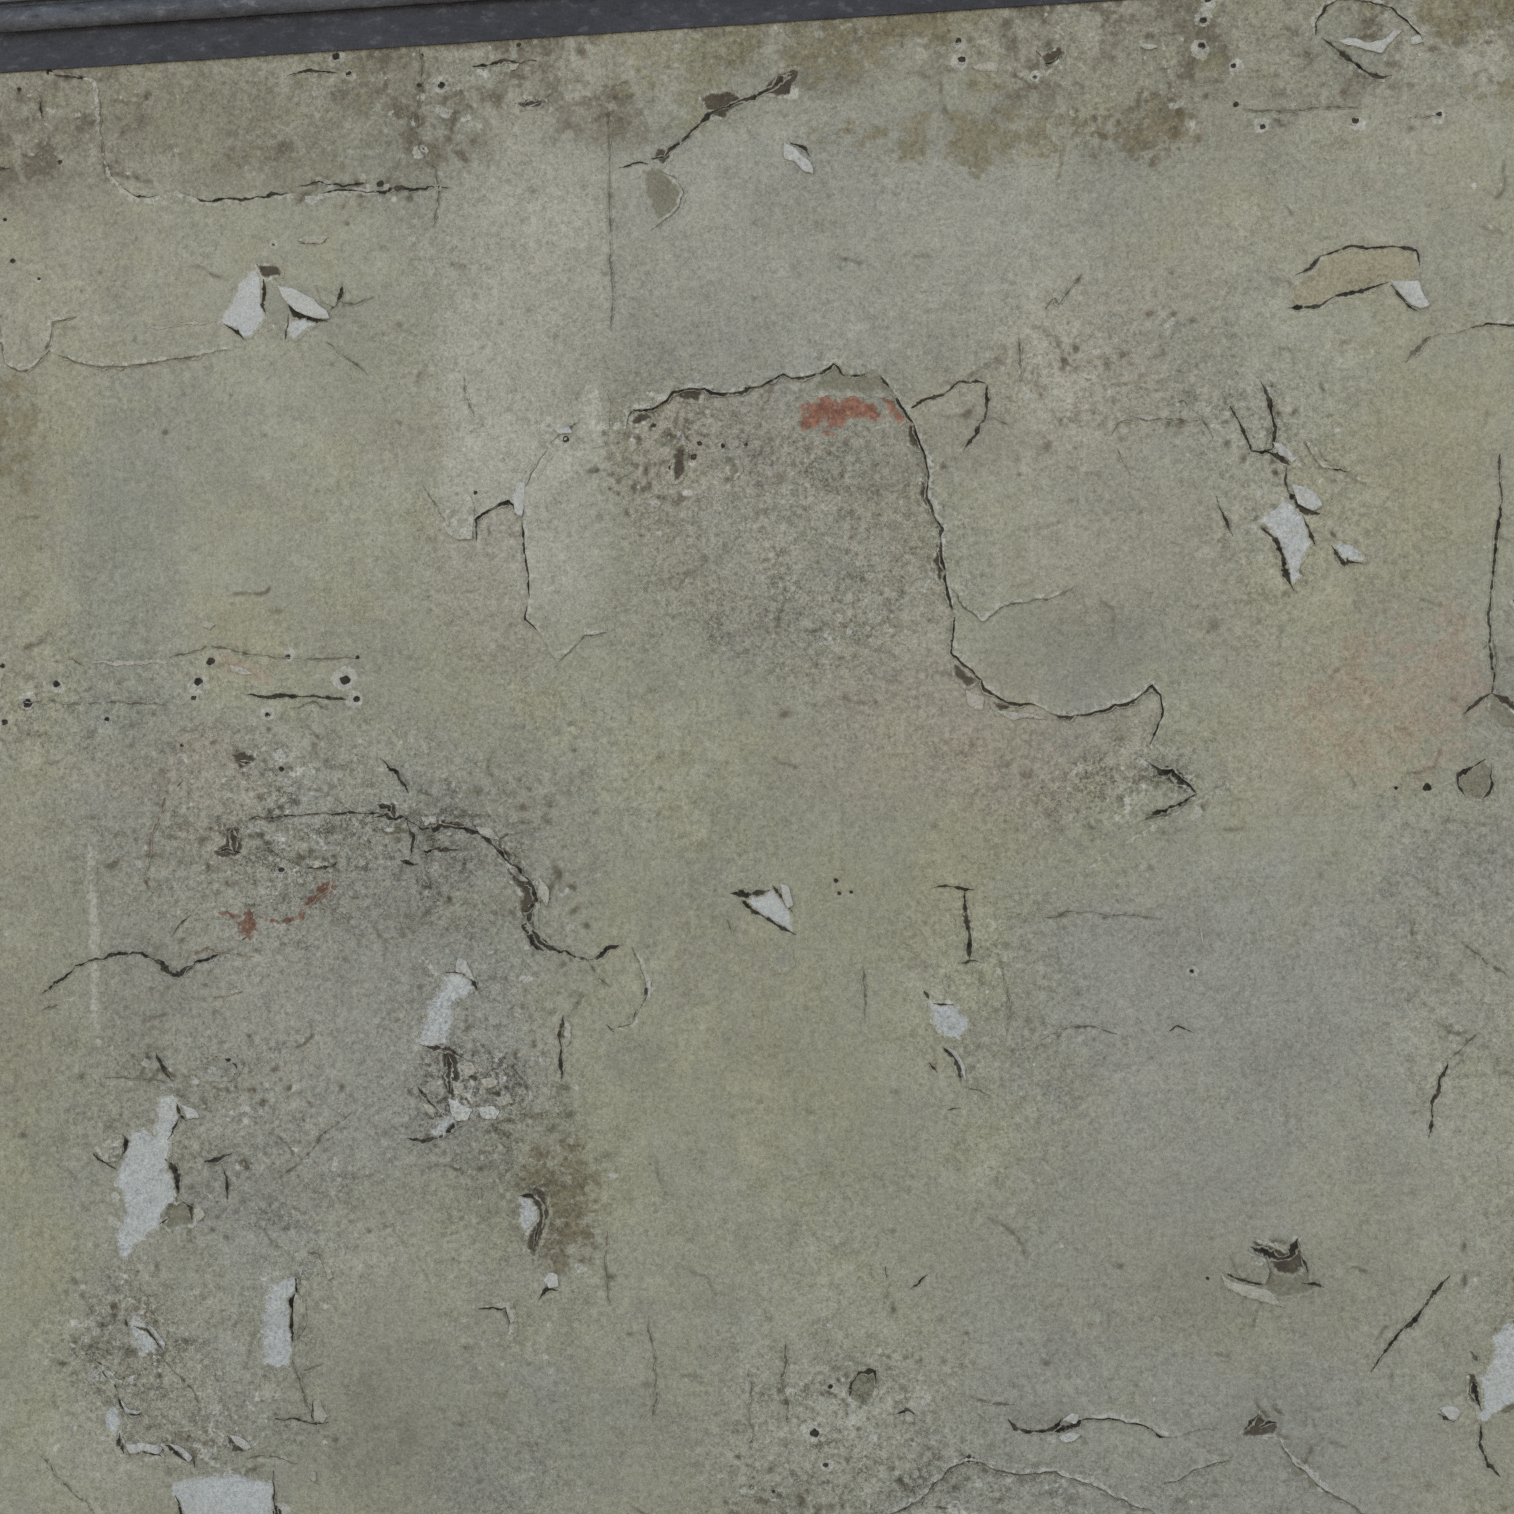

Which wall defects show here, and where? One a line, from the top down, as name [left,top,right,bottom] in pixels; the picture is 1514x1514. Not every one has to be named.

crack [652,66,803,167]
peeling [0,243,373,375]
crack [1405,333,1440,363]
peeling [1230,380,1367,591]
crack [1463,453,1514,732]
crack [42,915,254,1010]
peeling [404,957,536,1145]
crack [374,758,623,987]
peeling [92,1051,205,1260]
peeling [81,1285,316,1514]
crack [1371,1275,1451,1372]
peeling [1438,1319,1514,1477]